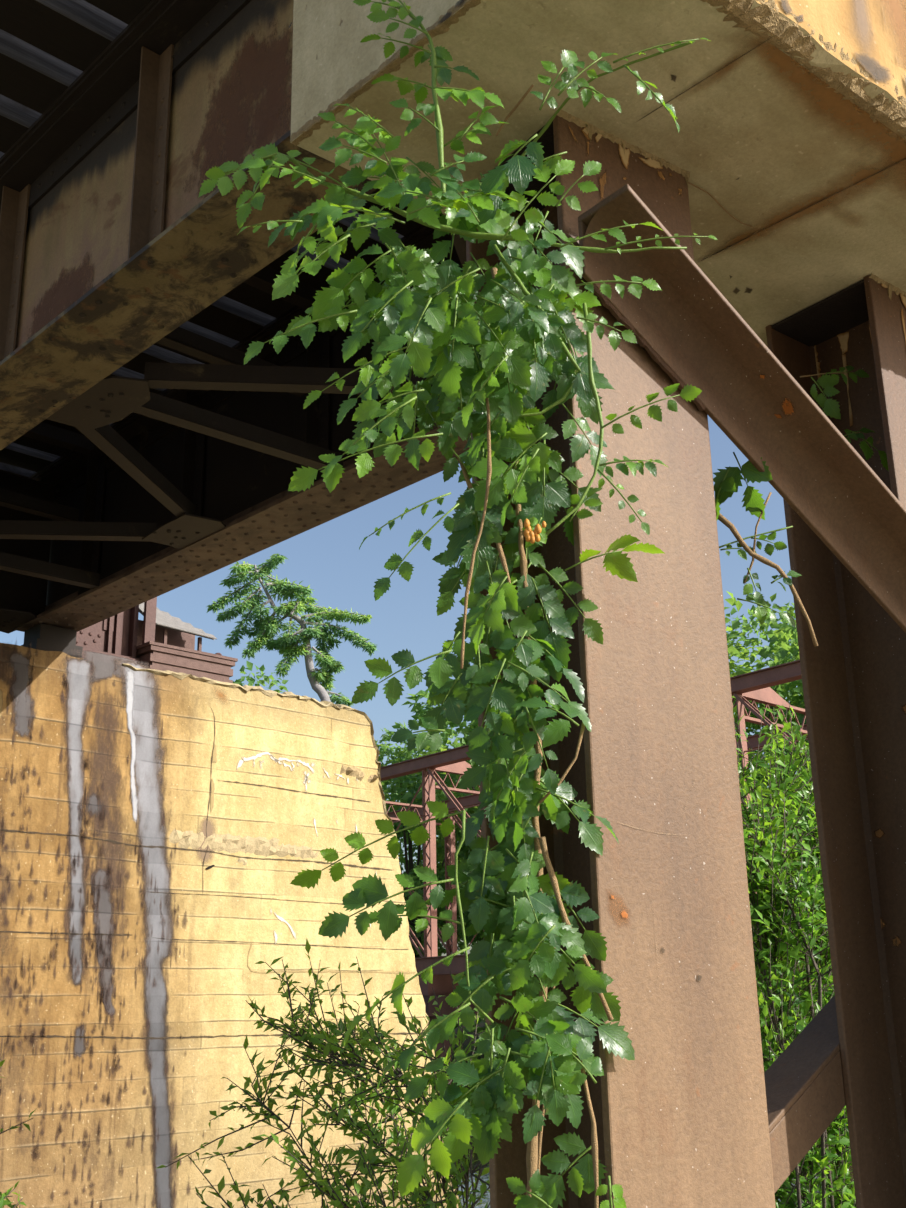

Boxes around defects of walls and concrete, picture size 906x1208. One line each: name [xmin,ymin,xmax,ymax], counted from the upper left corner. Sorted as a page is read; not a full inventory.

spalling [701,0,906,140]
leakage [854,0,906,82]
corrosion [715,40,906,252]
corrosion [28,255,94,339]